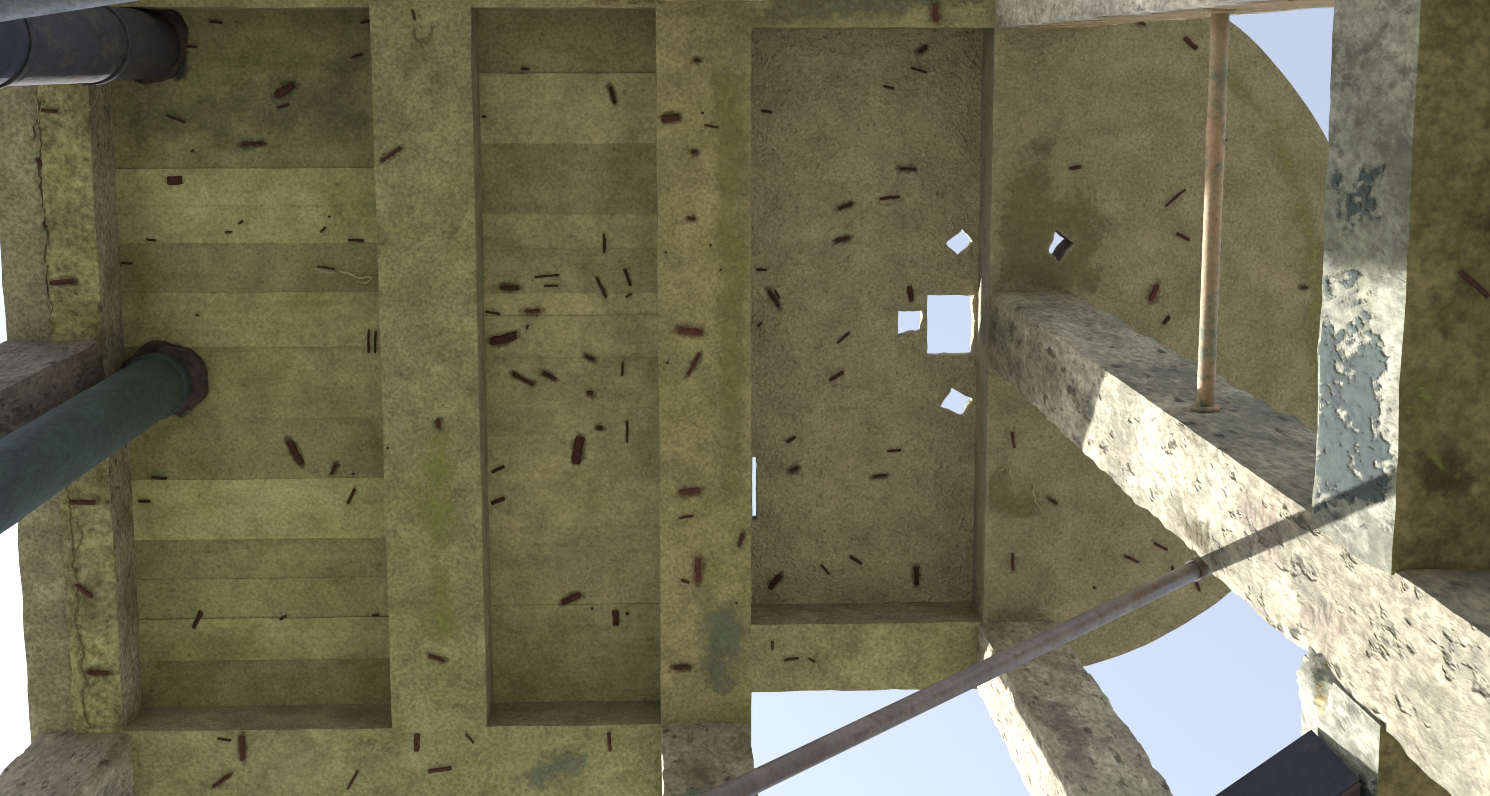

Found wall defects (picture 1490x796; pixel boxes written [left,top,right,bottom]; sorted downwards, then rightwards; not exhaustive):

corrosion [274,82,297,109]
crack [32,87,53,321]
corrosion [500,274,560,292]
corrosion [1458,269,1490,298]
corrosion [490,309,540,346]
corrosion [679,327,703,376]
corrosion [285,436,305,468]
corrosion [571,425,603,464]